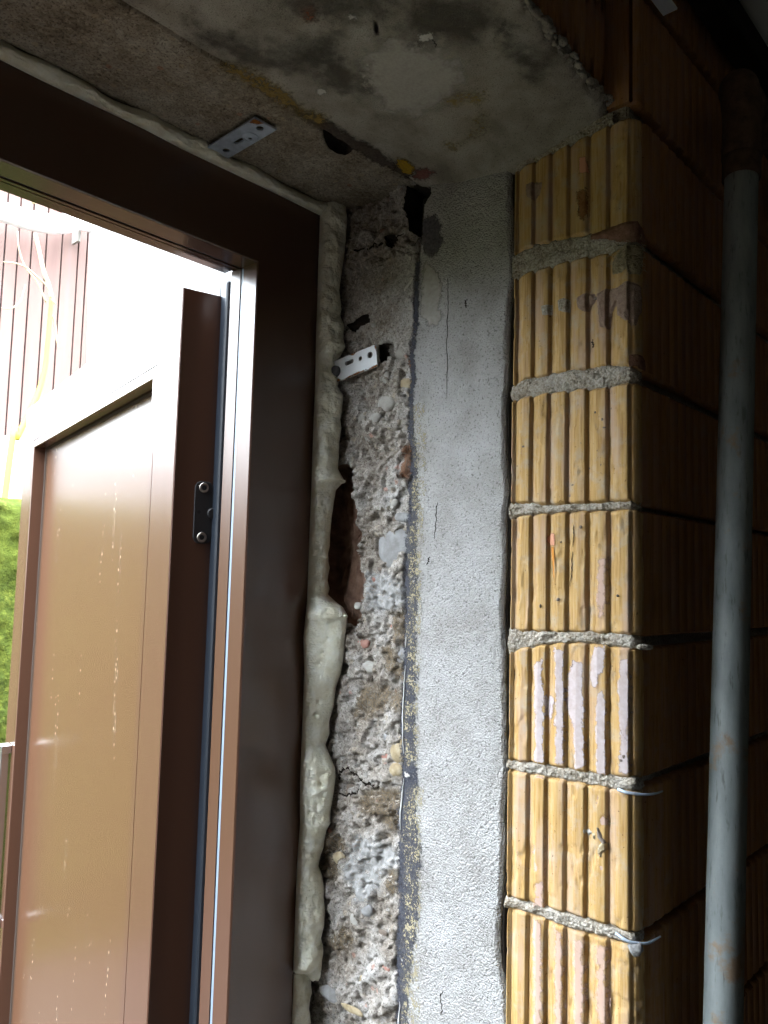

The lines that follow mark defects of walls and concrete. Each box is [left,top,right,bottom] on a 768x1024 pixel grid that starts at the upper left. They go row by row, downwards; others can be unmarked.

damp [410,2,487,43]
spalling [323,130,353,155]
spalling [403,184,431,239]
spalling [347,314,370,333]
spalling [379,343,393,363]
spalling [328,464,366,628]
crack [338,767,380,797]